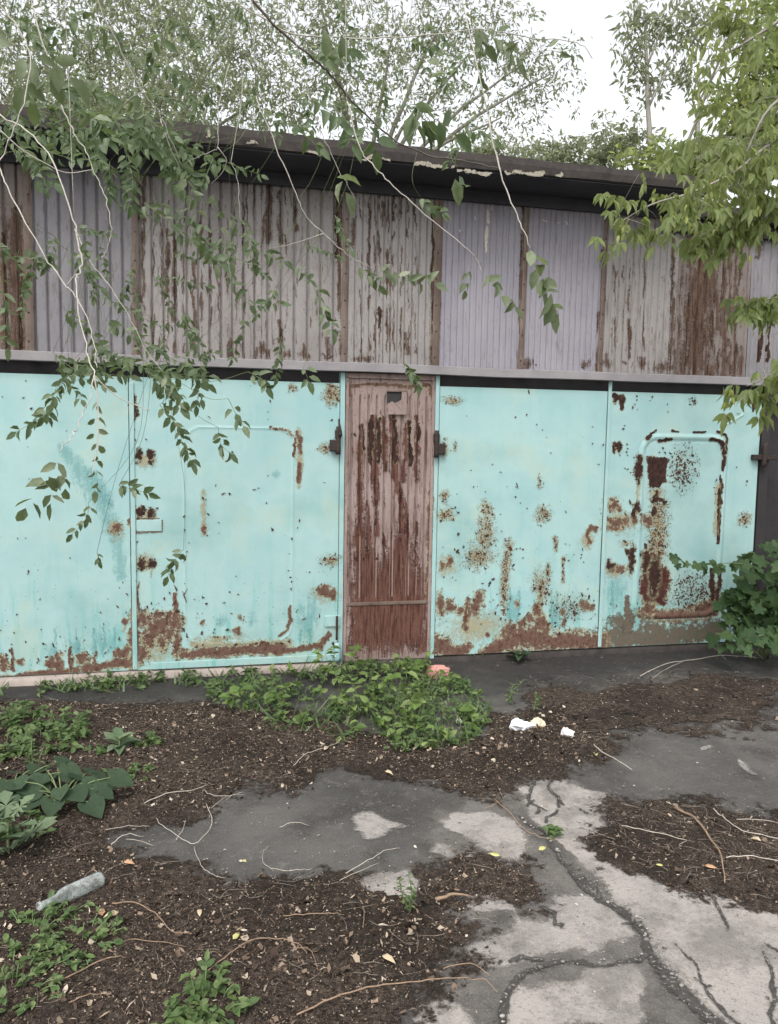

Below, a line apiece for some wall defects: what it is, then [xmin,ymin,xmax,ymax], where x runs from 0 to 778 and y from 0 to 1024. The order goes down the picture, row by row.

rust [0,206,35,350]
rust [130,174,310,359]
rust [323,191,442,366]
rust [581,233,744,377]
rust [756,325,771,363]
rust [0,382,732,676]